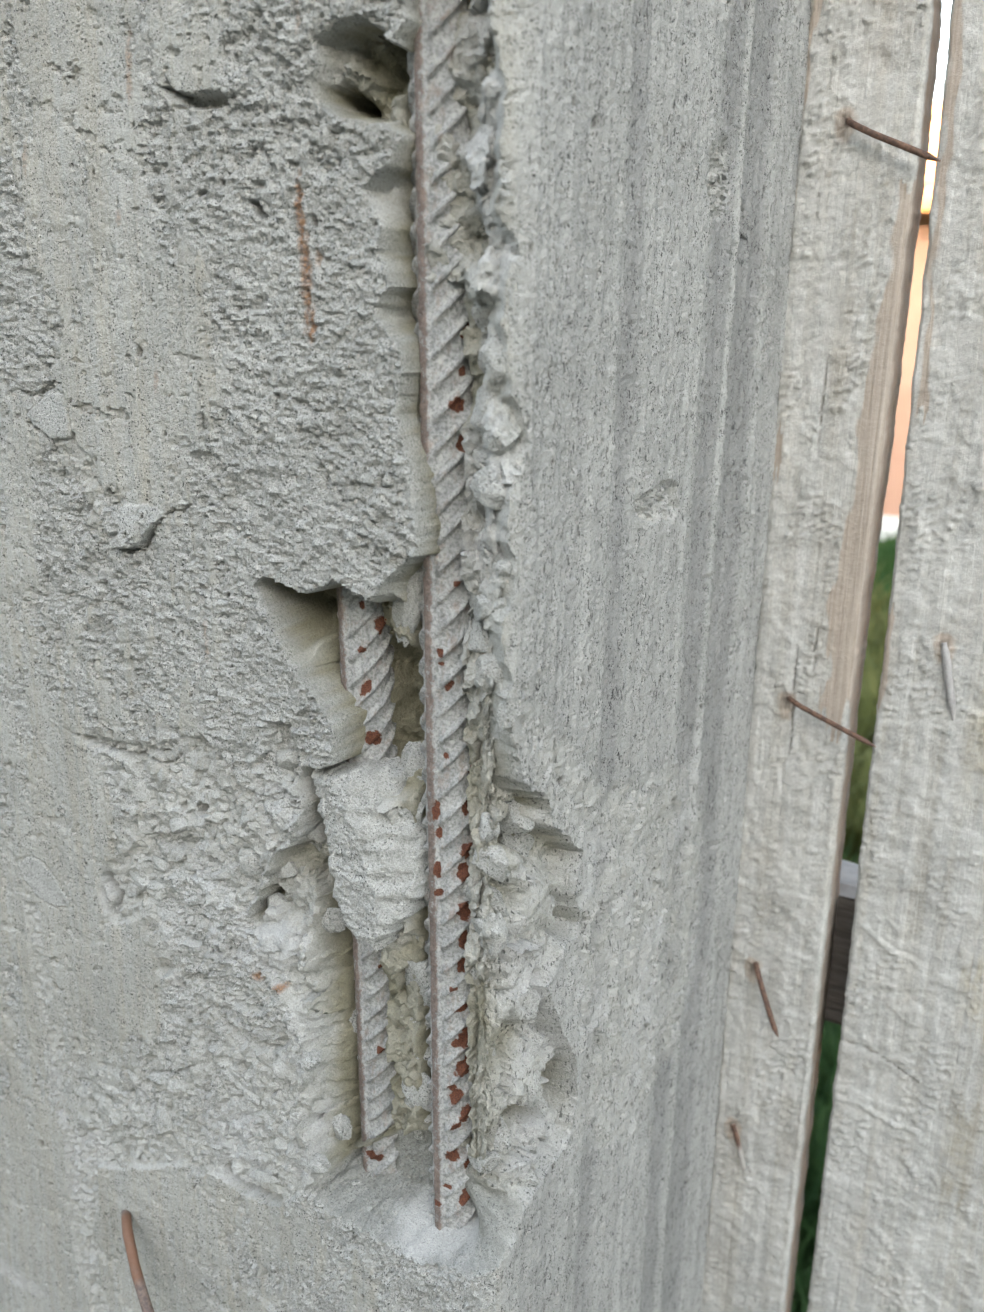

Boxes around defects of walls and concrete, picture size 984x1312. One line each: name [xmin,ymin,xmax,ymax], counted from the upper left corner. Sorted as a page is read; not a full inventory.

peeling [705,135,732,224]
corrosion [291,164,324,353]
corrosion [446,397,468,417]
corrosion [357,600,387,655]
spalling [21,0,706,1312]
corrosion [437,647,455,694]
corrosion [364,727,389,758]
corrosion [433,800,443,842]
corrosion [460,800,469,819]
corrosion [434,840,473,1131]
corrosion [444,1147,470,1170]
corrosion [434,1184,471,1209]